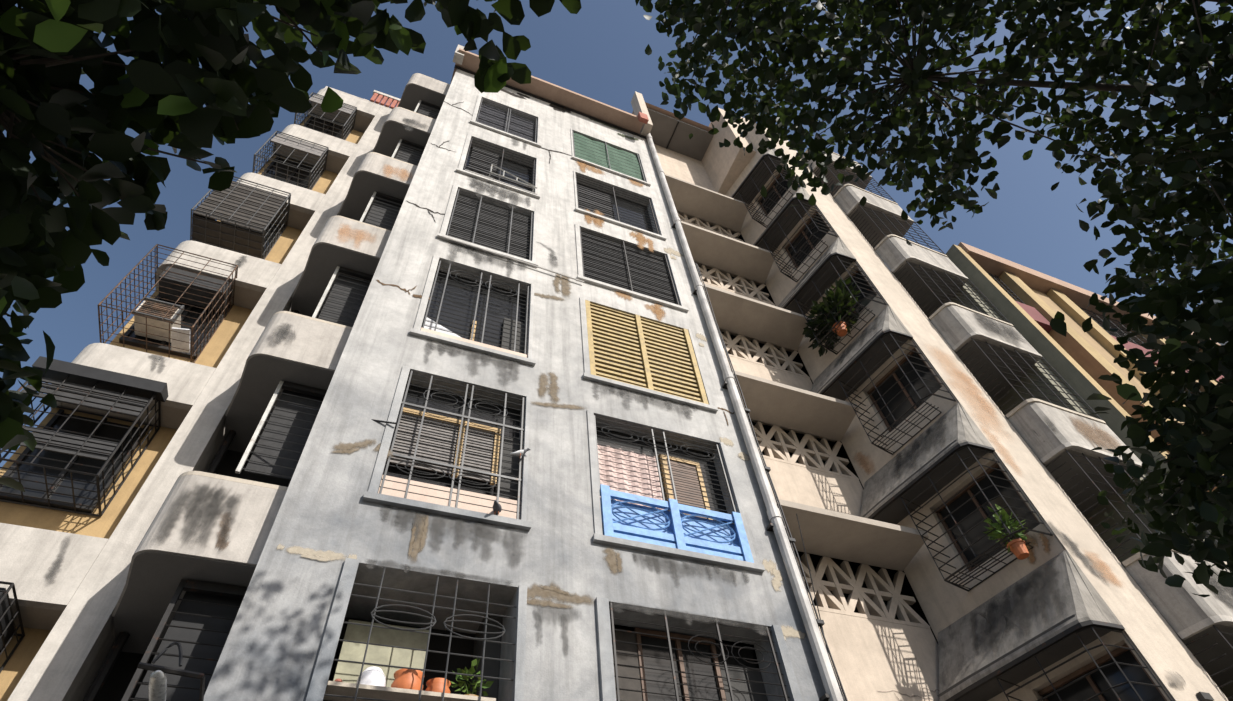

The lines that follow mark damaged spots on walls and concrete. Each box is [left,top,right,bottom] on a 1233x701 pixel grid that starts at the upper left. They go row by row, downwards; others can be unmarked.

crack [407,201,445,222]
crack [377,280,430,299]
peeling [538,374,548,396]
peeling [333,444,392,456]
damp [159,487,239,549]
peeling [277,544,357,561]
damp [972,565,1061,650]
crack [878,664,939,701]